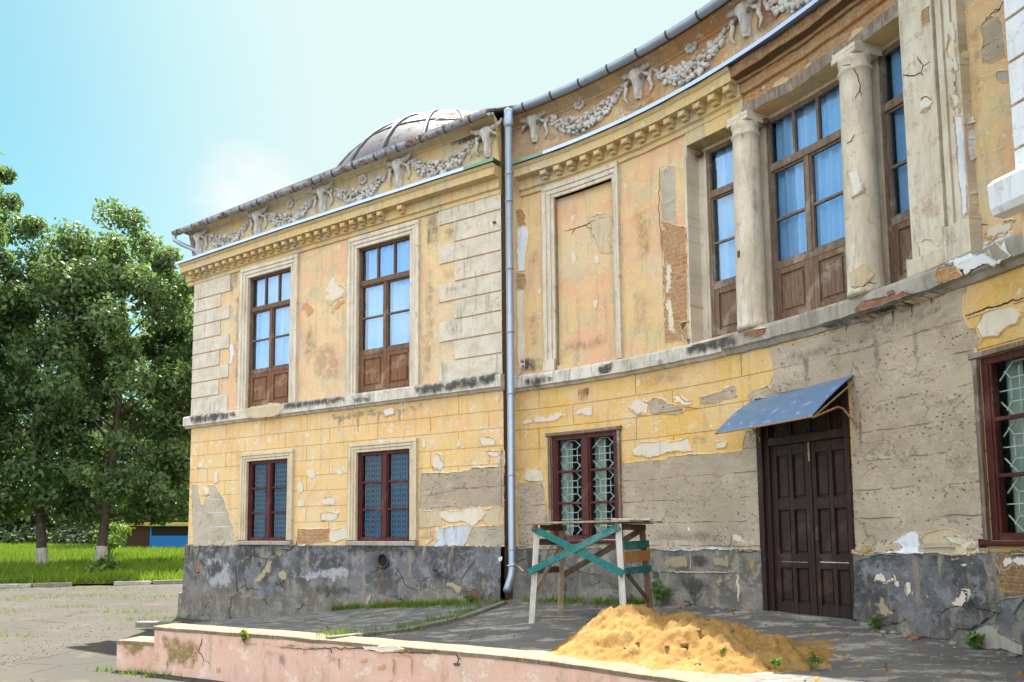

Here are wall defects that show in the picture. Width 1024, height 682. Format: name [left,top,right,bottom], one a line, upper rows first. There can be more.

flaking render [660,165,690,343]
peeling [326,276,347,314]
crack [965,297,1024,316]
water stain [333,399,382,430]
flaking render [629,217,1024,656]
flaking render [191,472,237,548]
flaking render [418,429,760,585]
crack [235,529,300,594]